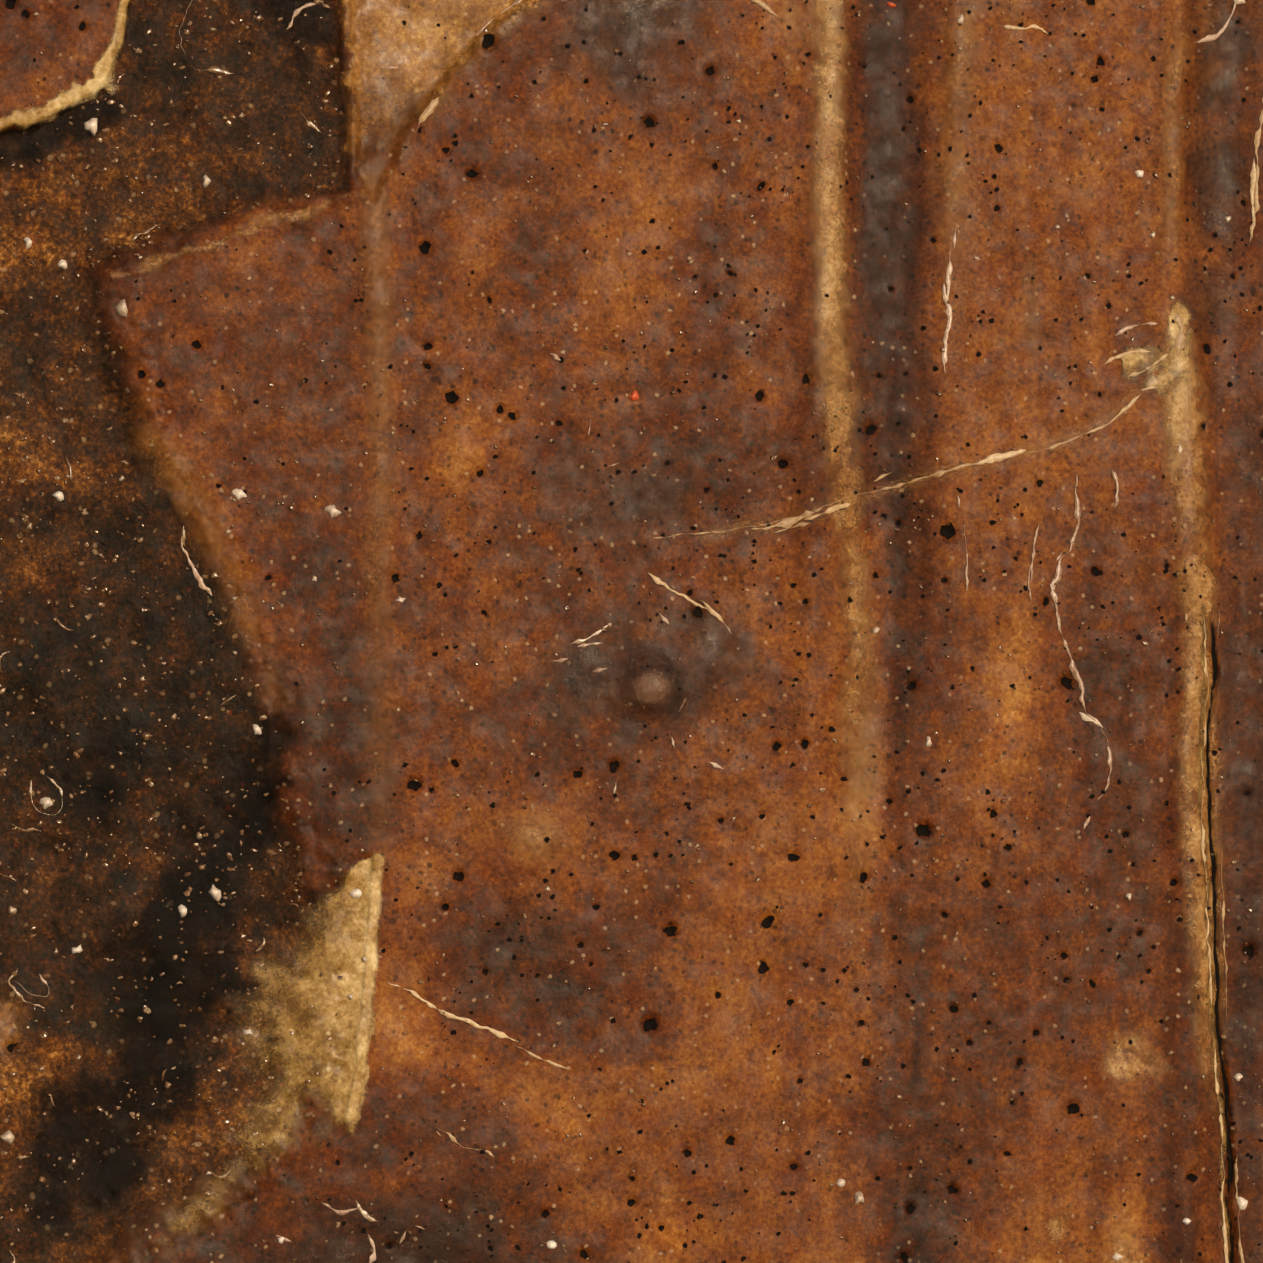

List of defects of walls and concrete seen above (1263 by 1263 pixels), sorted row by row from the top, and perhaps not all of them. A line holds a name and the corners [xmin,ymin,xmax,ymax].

spalling [0,0,541,1263]
leakage [812,0,869,787]
crack [1028,474,1112,828]
crack [1111,469,1119,508]
leakage [1163,327,1220,1035]
crack [1198,605,1245,1263]